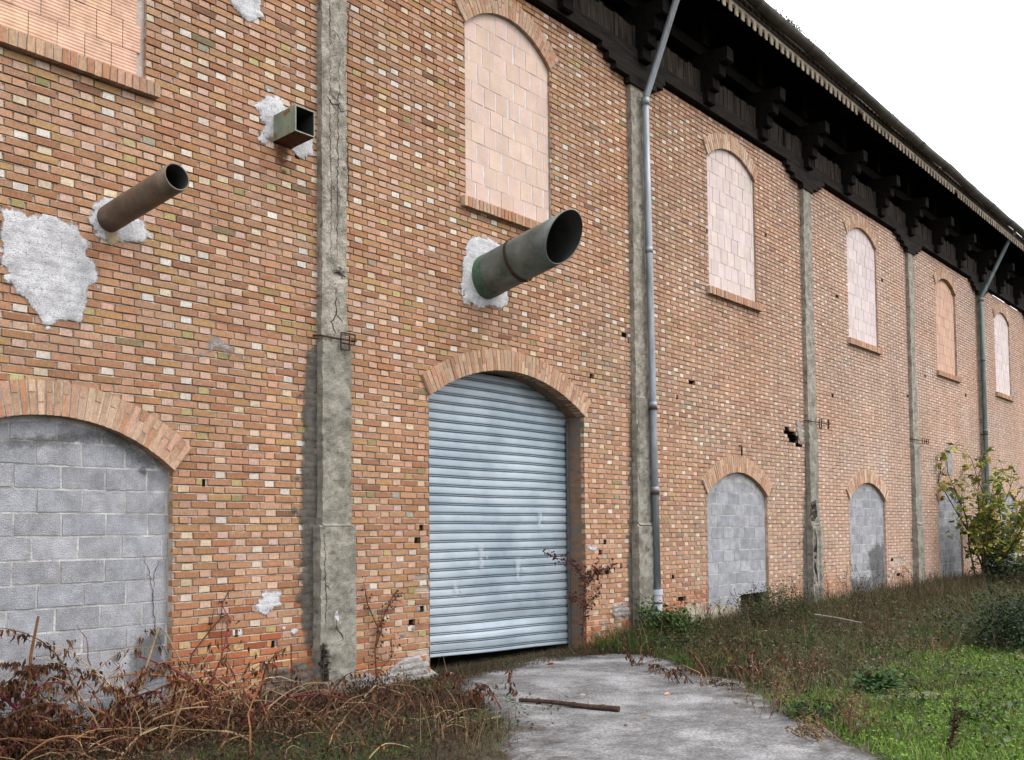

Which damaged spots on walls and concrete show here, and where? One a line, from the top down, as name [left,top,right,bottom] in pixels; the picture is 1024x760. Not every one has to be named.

crack [327,0,350,336]
spalling [783,426,802,447]
crack [144,558,167,654]